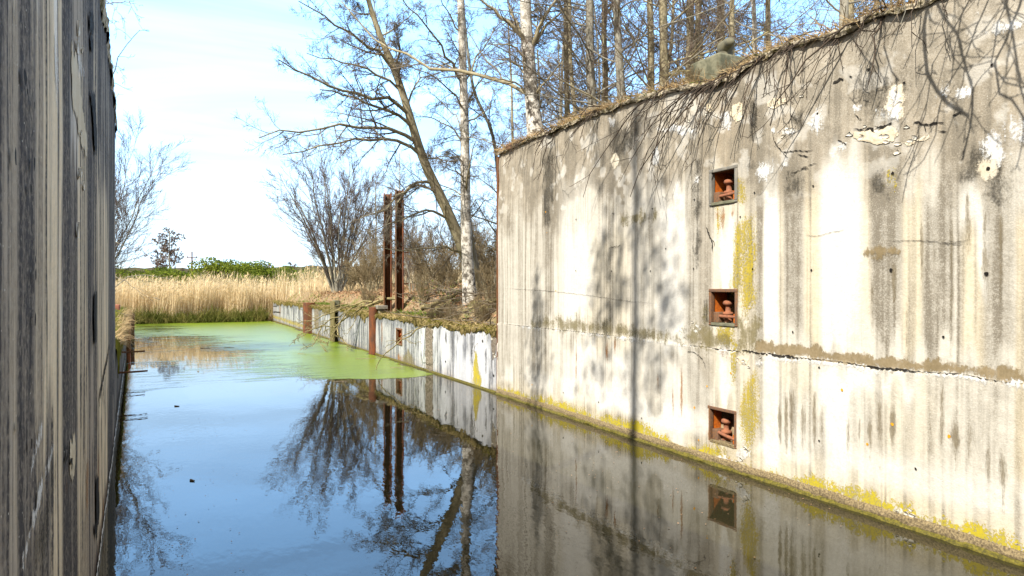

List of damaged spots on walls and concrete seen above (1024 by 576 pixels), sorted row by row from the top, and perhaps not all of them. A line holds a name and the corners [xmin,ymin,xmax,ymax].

spalling [845,83,930,155]
water stain [543,153,553,226]
water stain [749,160,788,182]
spalling [977,157,998,182]
water stain [960,115,1024,205]
water stain [863,245,900,302]
water stain [522,305,1024,389]
crack [686,344,1008,383]
water stain [778,395,815,447]
water stain [868,406,895,439]